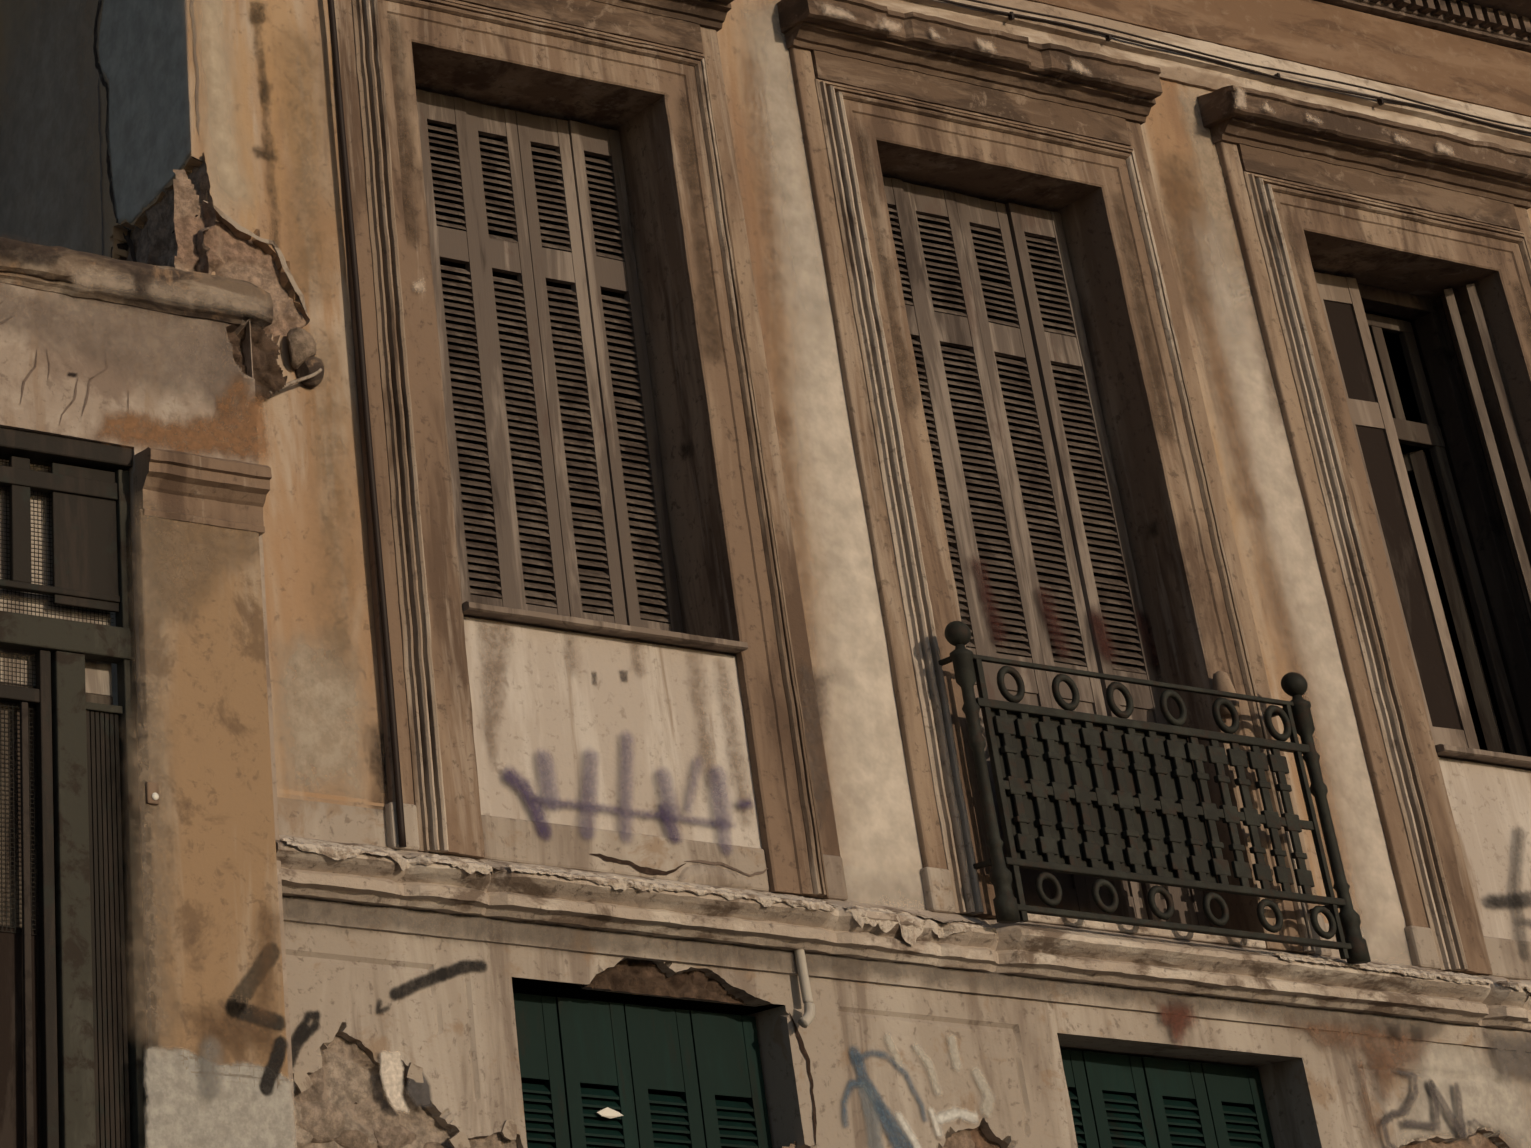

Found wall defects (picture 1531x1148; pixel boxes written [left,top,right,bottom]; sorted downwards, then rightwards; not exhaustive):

crack [93,0,137,262]
spalling [74,152,324,401]
crack [20,352,129,425]
water stain [134,516,256,1037]
spalling [579,958,774,1007]
spalling [293,1035,518,1148]
spalling [943,1126,1001,1148]